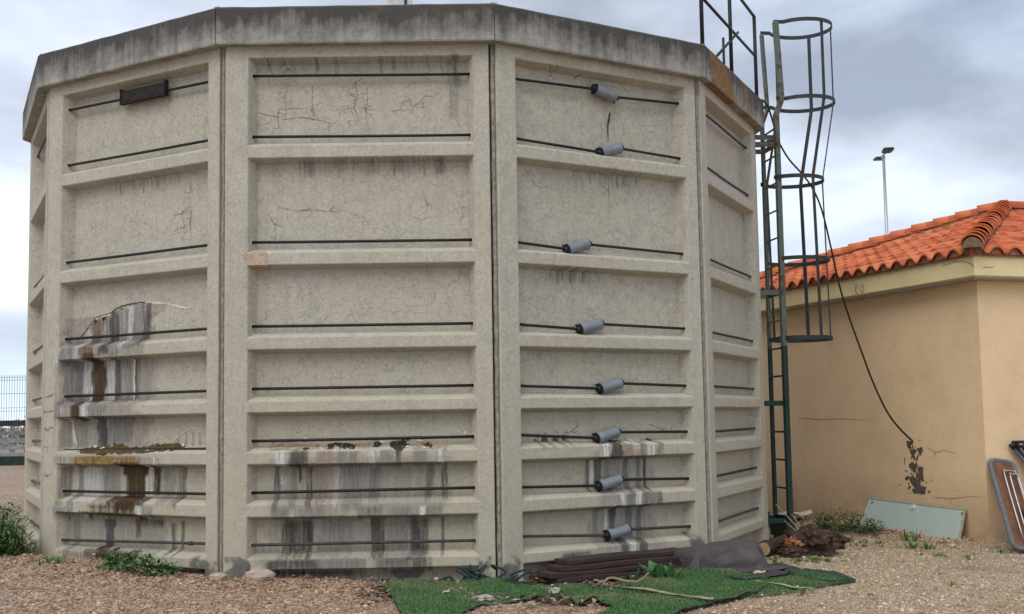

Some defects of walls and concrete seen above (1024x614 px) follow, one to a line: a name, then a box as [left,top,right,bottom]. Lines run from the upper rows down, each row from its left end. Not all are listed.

crack [259,56,427,132]
spalling [80,301,194,337]
water stain [53,304,157,448]
water stain [71,518,183,558]
water stain [189,449,448,580]
spalling [268,438,448,451]
water stain [586,442,663,551]
peeling [898,440,933,494]